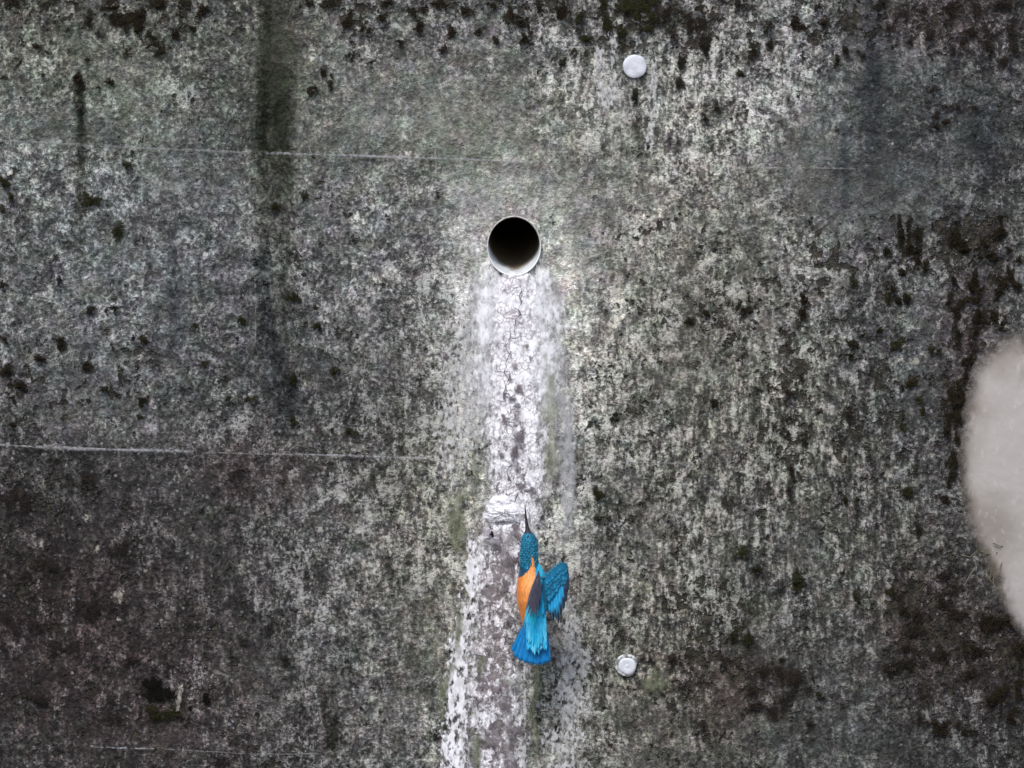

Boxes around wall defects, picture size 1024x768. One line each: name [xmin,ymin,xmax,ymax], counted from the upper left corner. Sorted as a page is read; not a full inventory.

efflorescence [594,34,617,112]
efflorescence [645,57,658,152]
crack [497,286,529,484]
damp [432,263,599,768]